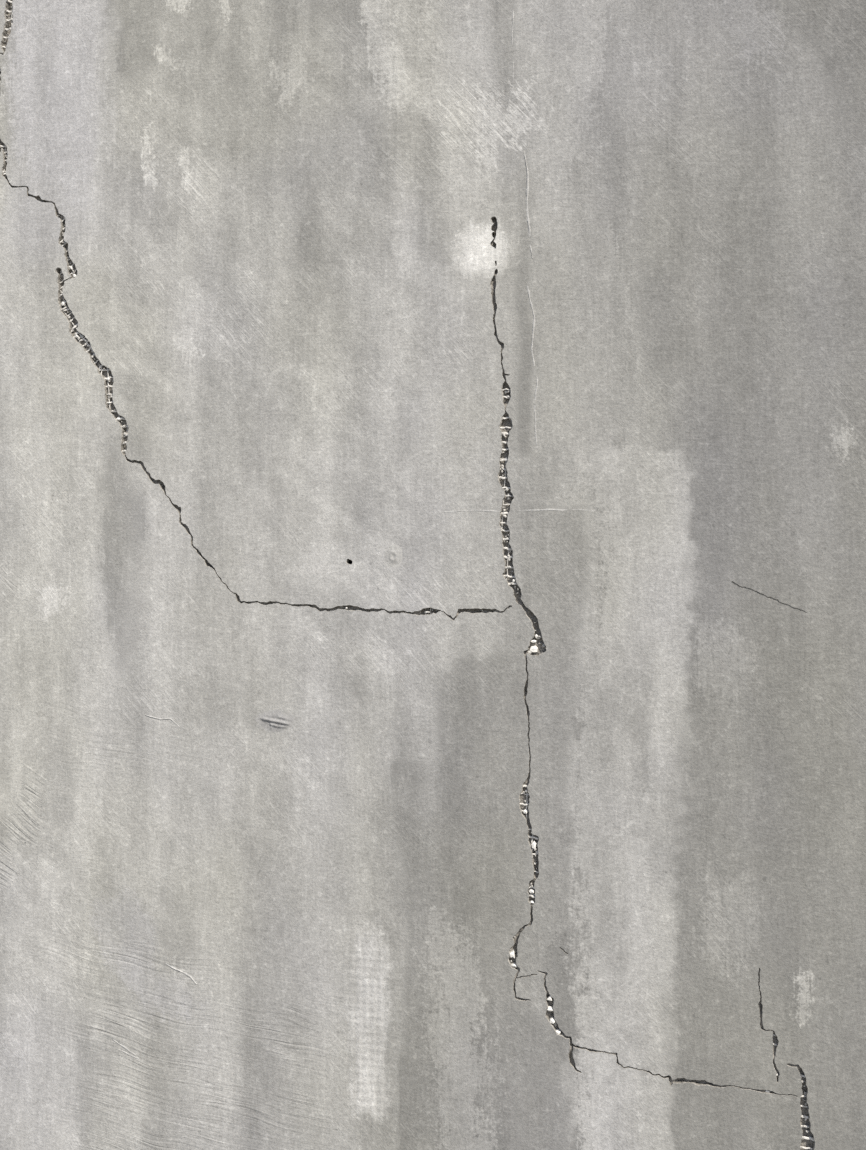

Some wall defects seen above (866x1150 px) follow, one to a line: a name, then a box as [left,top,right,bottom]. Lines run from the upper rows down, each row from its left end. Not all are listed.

crack [0,0,13,81]
crack [0,139,512,621]
crack [490,261,815,1150]